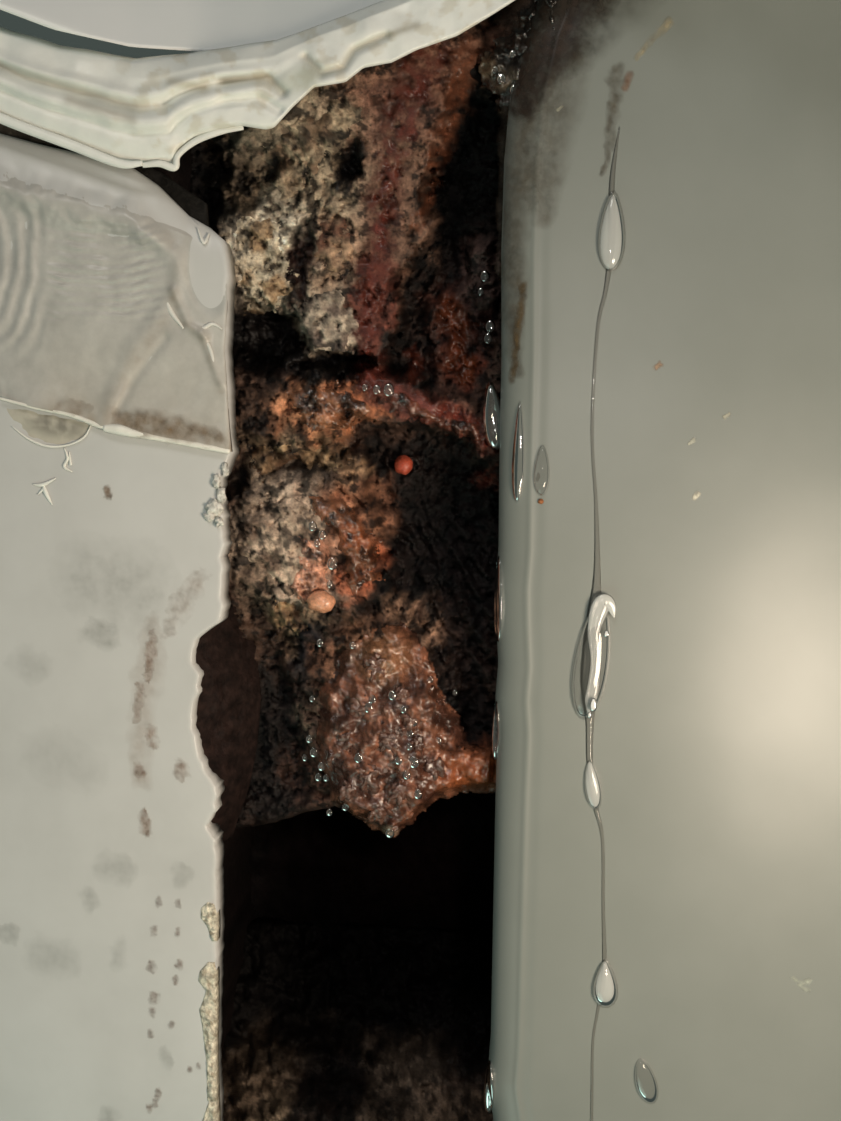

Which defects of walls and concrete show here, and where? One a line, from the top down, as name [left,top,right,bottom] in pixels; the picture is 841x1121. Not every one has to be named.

water stain [511,0,614,153]
corrosion [357,43,500,451]
water stain [511,277,525,381]
spalling [0,0,522,842]
spalling [201,902,221,941]
spalling [198,962,221,1121]